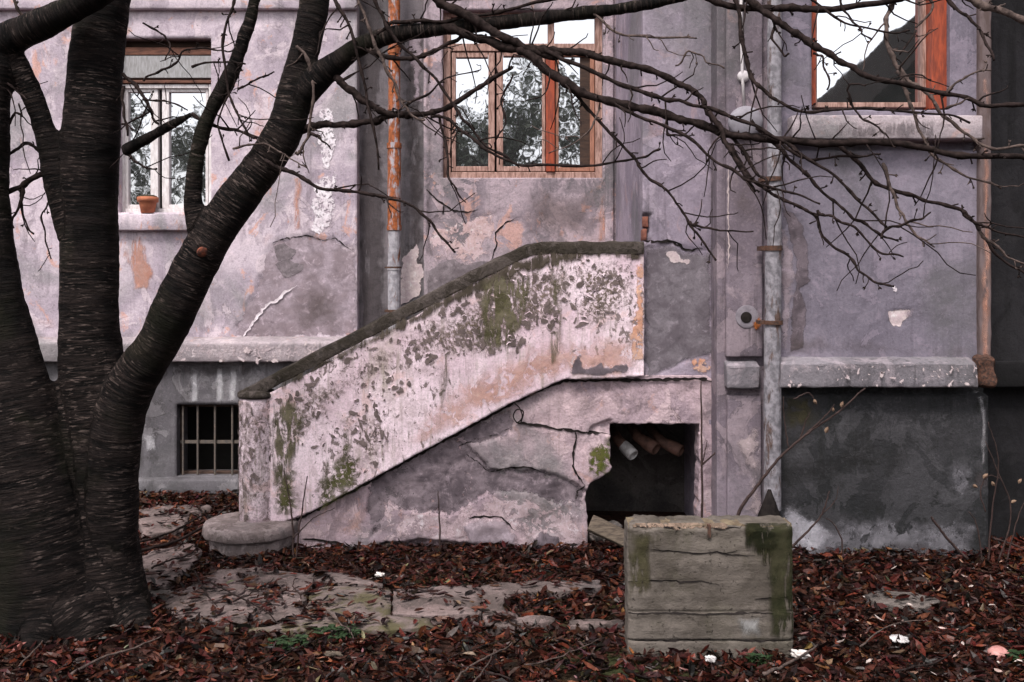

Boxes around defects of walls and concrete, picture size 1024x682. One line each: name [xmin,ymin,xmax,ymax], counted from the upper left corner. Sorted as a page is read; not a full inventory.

flaking render [177,108,357,364]
crack [243,285,297,336]
flaking render [888,309,910,327]
flaking render [238,211,711,546]
crack [296,377,712,548]
leakage [786,512,974,556]
leakage [741,620,758,632]